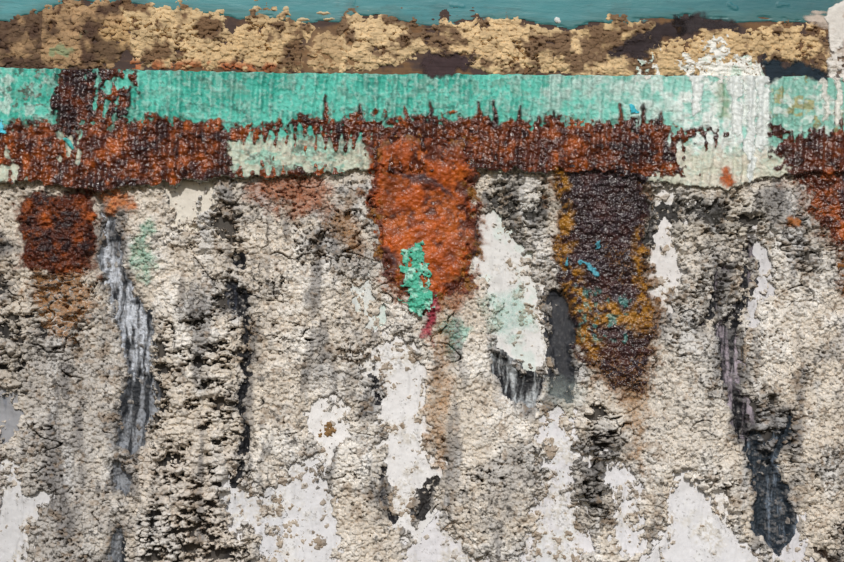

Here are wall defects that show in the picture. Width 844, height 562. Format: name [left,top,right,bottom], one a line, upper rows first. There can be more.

rust [0,68,730,434]
flaking render [471,205,554,375]
rust [720,167,734,187]
rust [767,112,844,294]
flaking render [0,387,57,562]
flaking render [218,255,490,562]
flaking render [505,401,816,562]